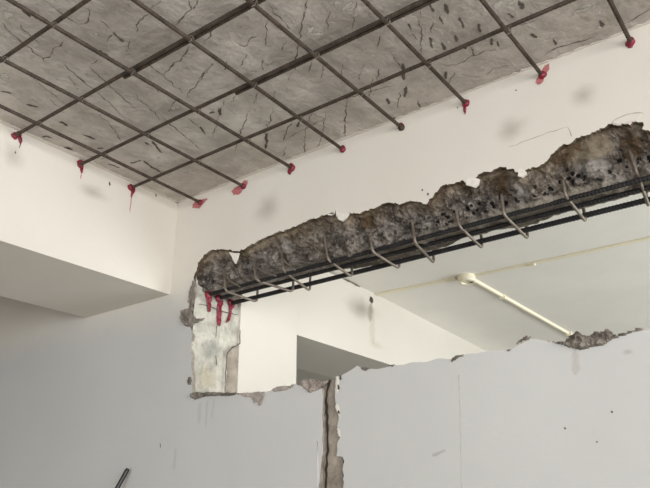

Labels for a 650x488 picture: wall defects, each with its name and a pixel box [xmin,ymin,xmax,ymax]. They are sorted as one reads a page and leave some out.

crack [3,17,63,62]
crack [74,72,160,139]
crack [150,48,206,96]
spalling [179,113,650,327]
spalling [548,328,644,350]
spalling [272,375,343,488]
crack [317,380,344,488]